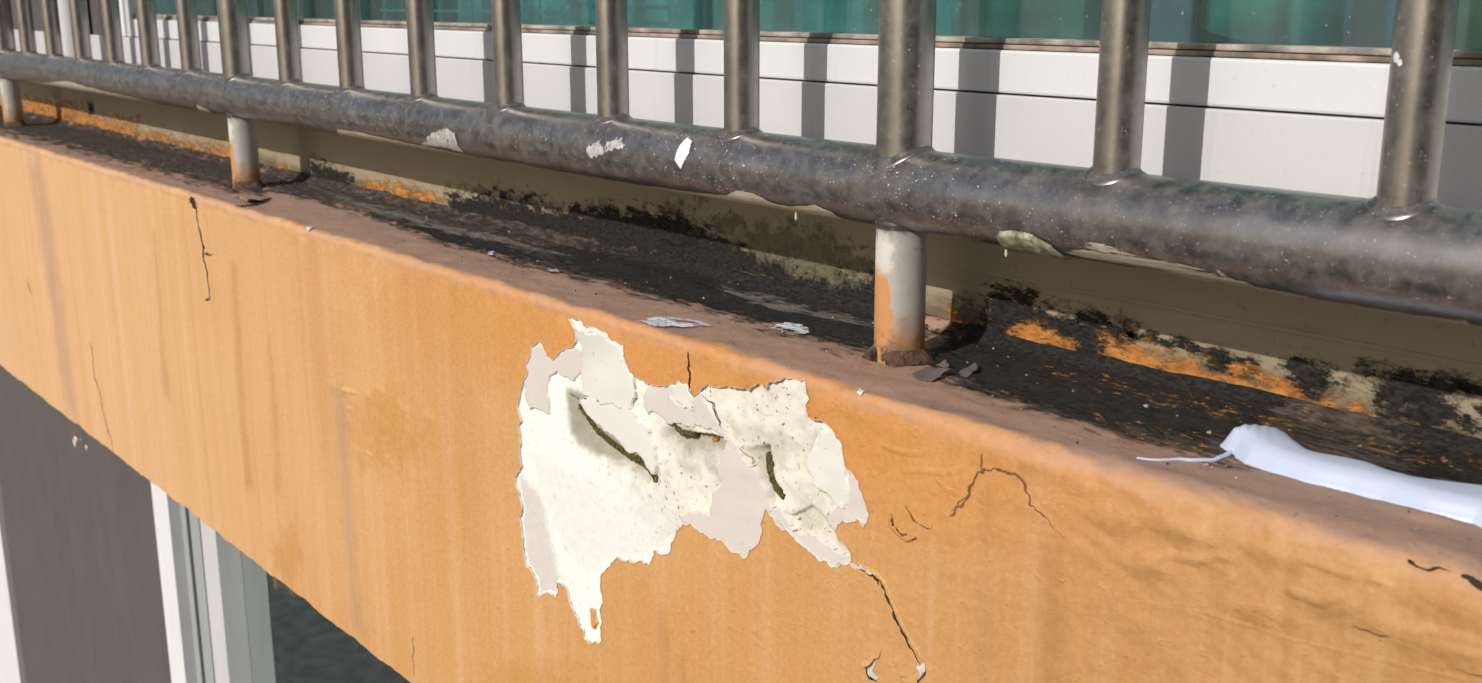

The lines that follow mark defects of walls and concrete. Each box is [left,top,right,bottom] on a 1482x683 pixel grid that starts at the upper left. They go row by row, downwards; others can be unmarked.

rust [21,94,231,158]
crack [189,196,212,301]
water stain [0,105,875,354]
water stain [918,279,1482,485]
rust [1007,320,1482,471]
peeling [514,316,869,644]
crack [949,454,1063,538]
crack [850,563,926,683]
crack [1407,559,1482,591]